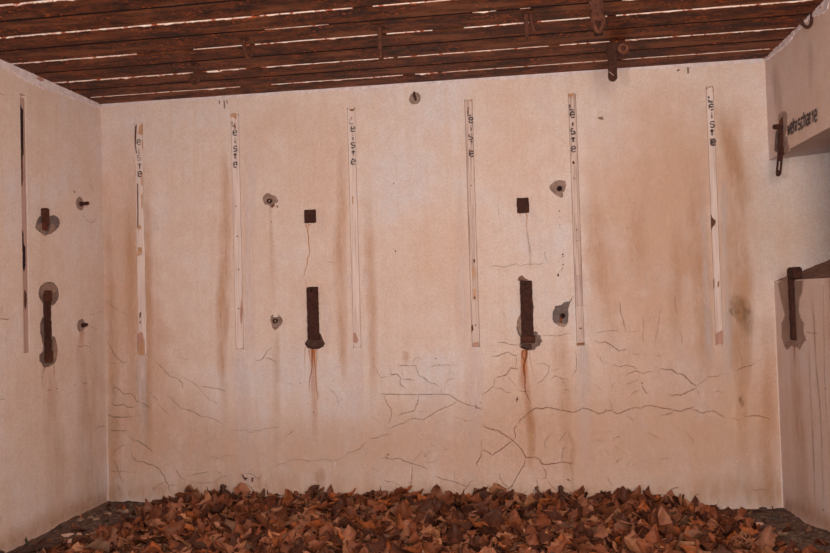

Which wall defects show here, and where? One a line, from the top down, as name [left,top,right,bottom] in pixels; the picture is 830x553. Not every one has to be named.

crack [476,342,701,468]